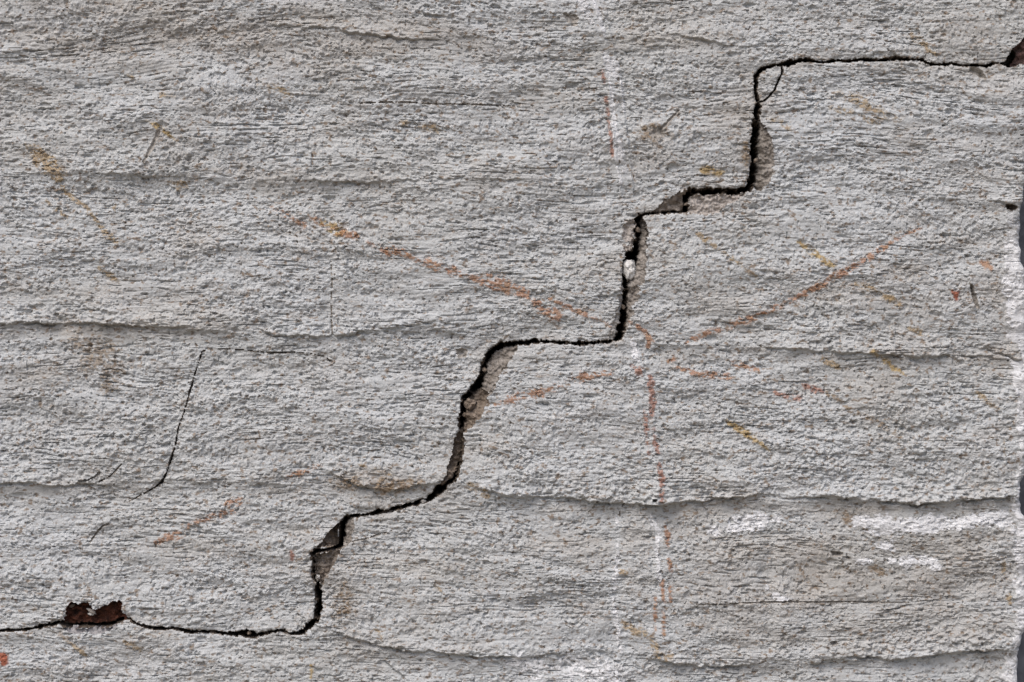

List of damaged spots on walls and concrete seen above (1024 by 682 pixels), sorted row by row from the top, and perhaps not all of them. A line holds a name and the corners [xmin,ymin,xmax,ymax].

crack [126,55,1003,639]
crack [78,463,122,482]
crack [0,620,64,632]